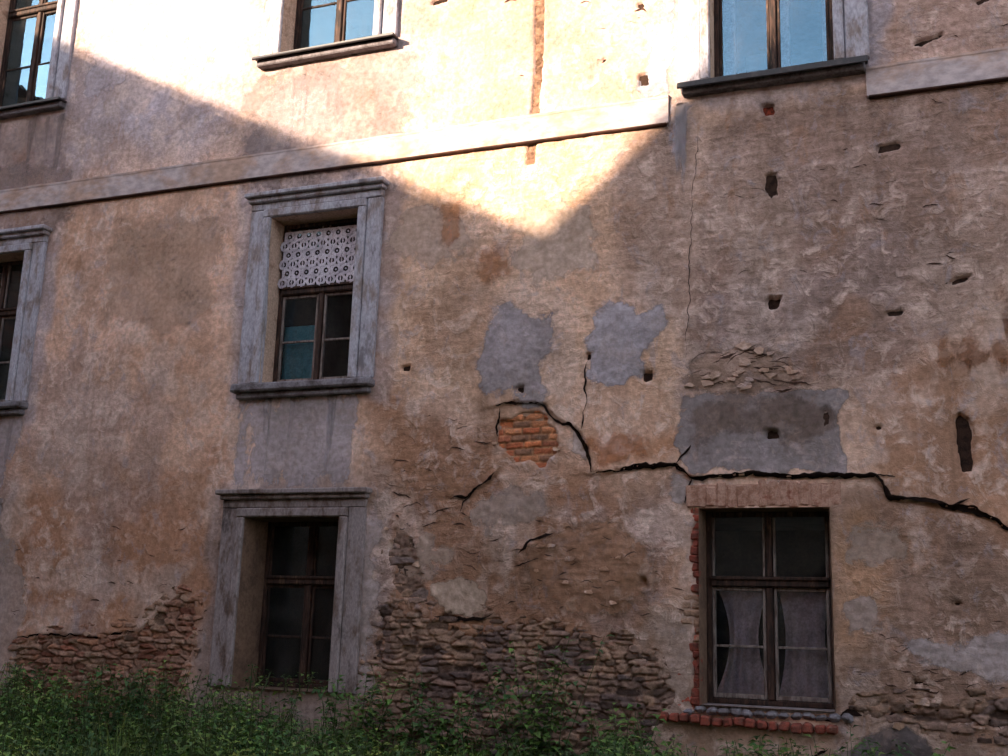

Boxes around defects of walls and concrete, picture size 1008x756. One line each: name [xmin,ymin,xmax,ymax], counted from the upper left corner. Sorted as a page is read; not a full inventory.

crack [450,473,494,511]
peeling [475,301,589,482]
peeling [584,301,668,386]
peeling [684,340,813,395]
crack [495,362,1008,531]
spalling [2,584,207,731]
spalling [356,474,700,756]
spalling [843,597,1008,746]